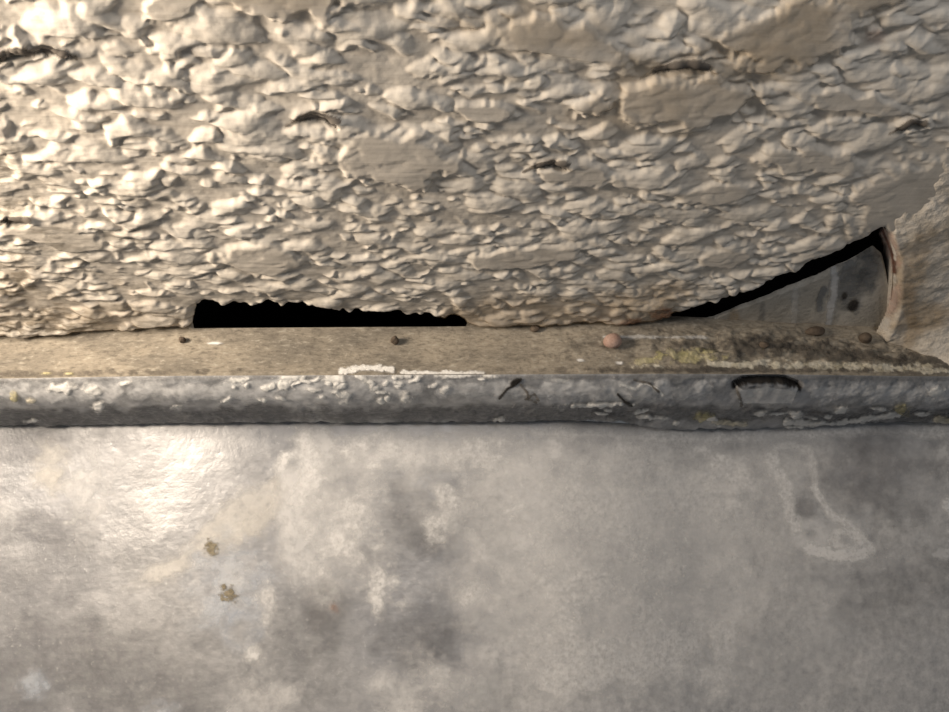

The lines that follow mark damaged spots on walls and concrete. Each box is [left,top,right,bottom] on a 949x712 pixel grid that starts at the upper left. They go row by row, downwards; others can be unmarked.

crack [0,47,78,62]
crack [640,60,710,78]
crack [285,114,341,127]
crack [522,161,571,173]
spalling [670,227,888,327]
hole [193,299,467,328]